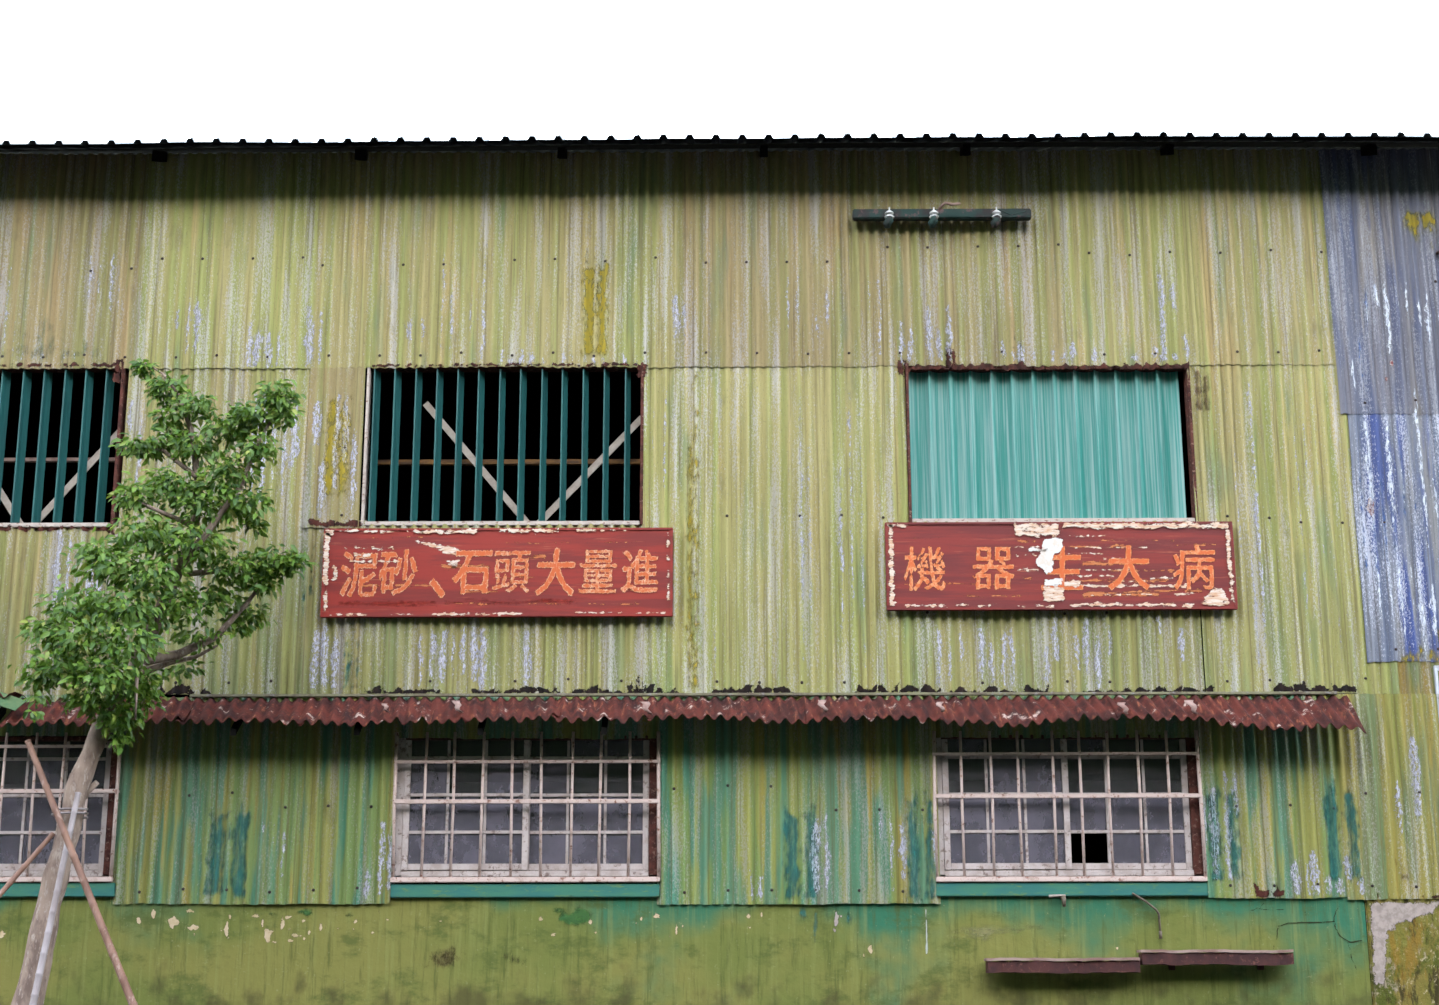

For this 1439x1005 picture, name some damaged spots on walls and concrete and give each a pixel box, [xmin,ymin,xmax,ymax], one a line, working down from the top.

corrosion [0,692,101,727]
corrosion [120,675,1367,734]
spalling [137,909,199,936]